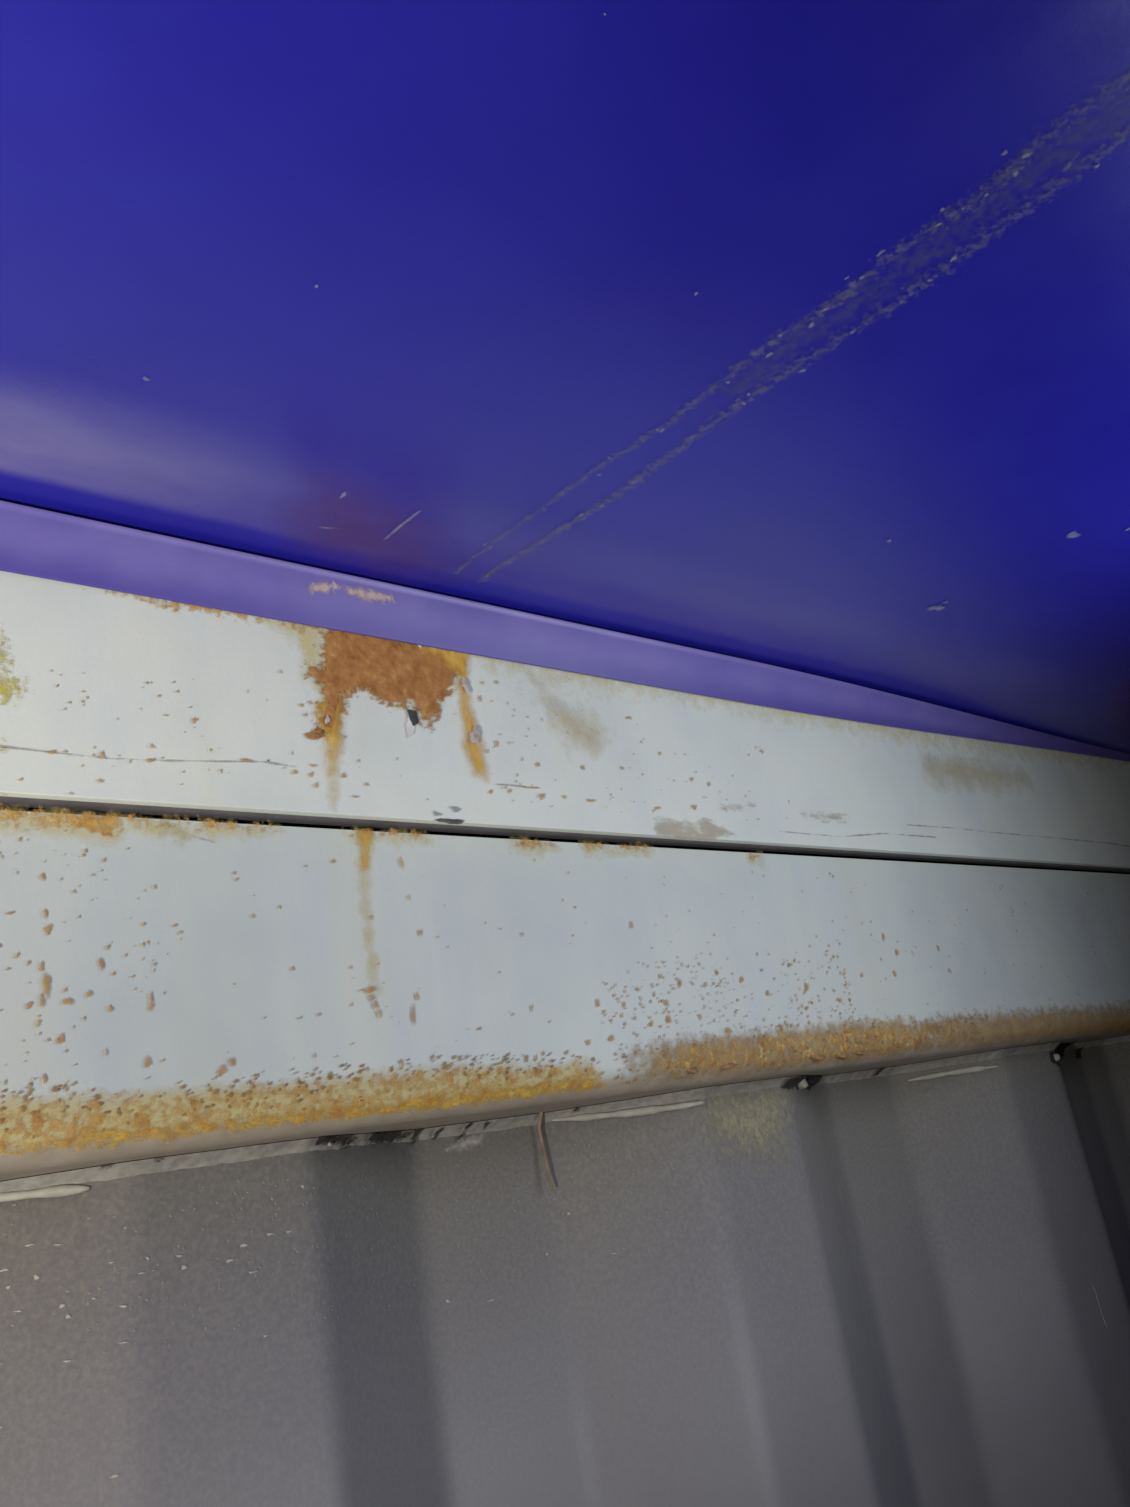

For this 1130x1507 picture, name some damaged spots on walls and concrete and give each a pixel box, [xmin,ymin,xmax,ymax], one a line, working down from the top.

corrosion [283,622,566,807]
corrosion [0,793,163,893]
corrosion [187,818,271,831]
corrosion [352,829,421,866]
corrosion [99,918,168,1011]
corrosion [0,934,1130,1153]